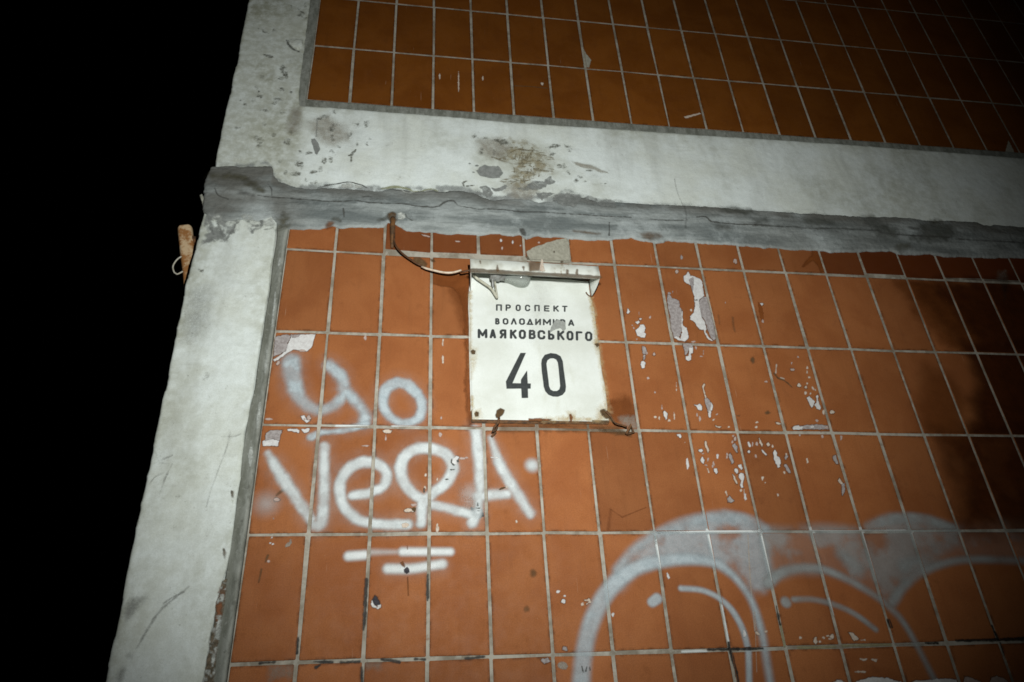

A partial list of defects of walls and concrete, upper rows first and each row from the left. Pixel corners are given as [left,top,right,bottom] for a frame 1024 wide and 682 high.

spalling [284,139,332,184]
crack [212,149,789,235]
spalling [500,238,571,263]
peeling [667,255,716,361]
peeling [273,334,316,365]
peeling [775,356,835,438]
peeling [686,384,791,503]